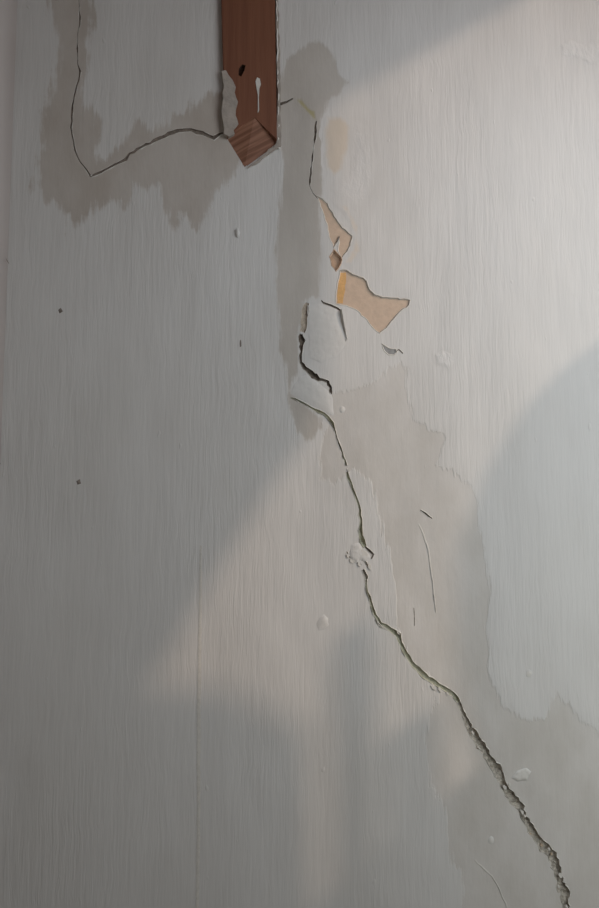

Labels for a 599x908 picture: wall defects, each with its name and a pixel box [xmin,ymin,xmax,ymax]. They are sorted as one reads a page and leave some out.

leakage [26,0,247,243]
crack [70,5,224,178]
spalling [317,196,411,356]
crack [290,300,571,908]